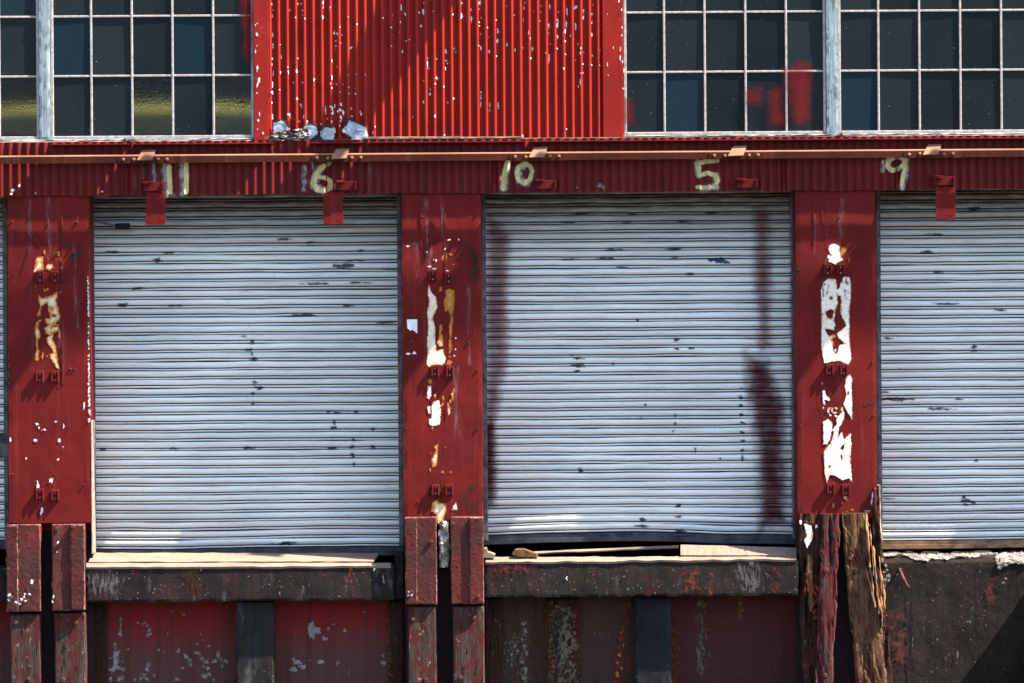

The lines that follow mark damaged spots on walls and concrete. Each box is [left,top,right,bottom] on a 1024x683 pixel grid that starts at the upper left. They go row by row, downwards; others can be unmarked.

peeling [33,250,63,273]
peeling [825,243,850,265]
peeling [35,286,62,370]
peeling [427,285,456,430]
peeling [821,277,853,483]
peeling [429,441,452,473]
peeling [431,500,457,522]
rust [683,568,714,594]
peeling [295,620,347,641]
peeling [109,618,164,682]
peeling [175,633,229,682]
peeling [289,658,350,673]